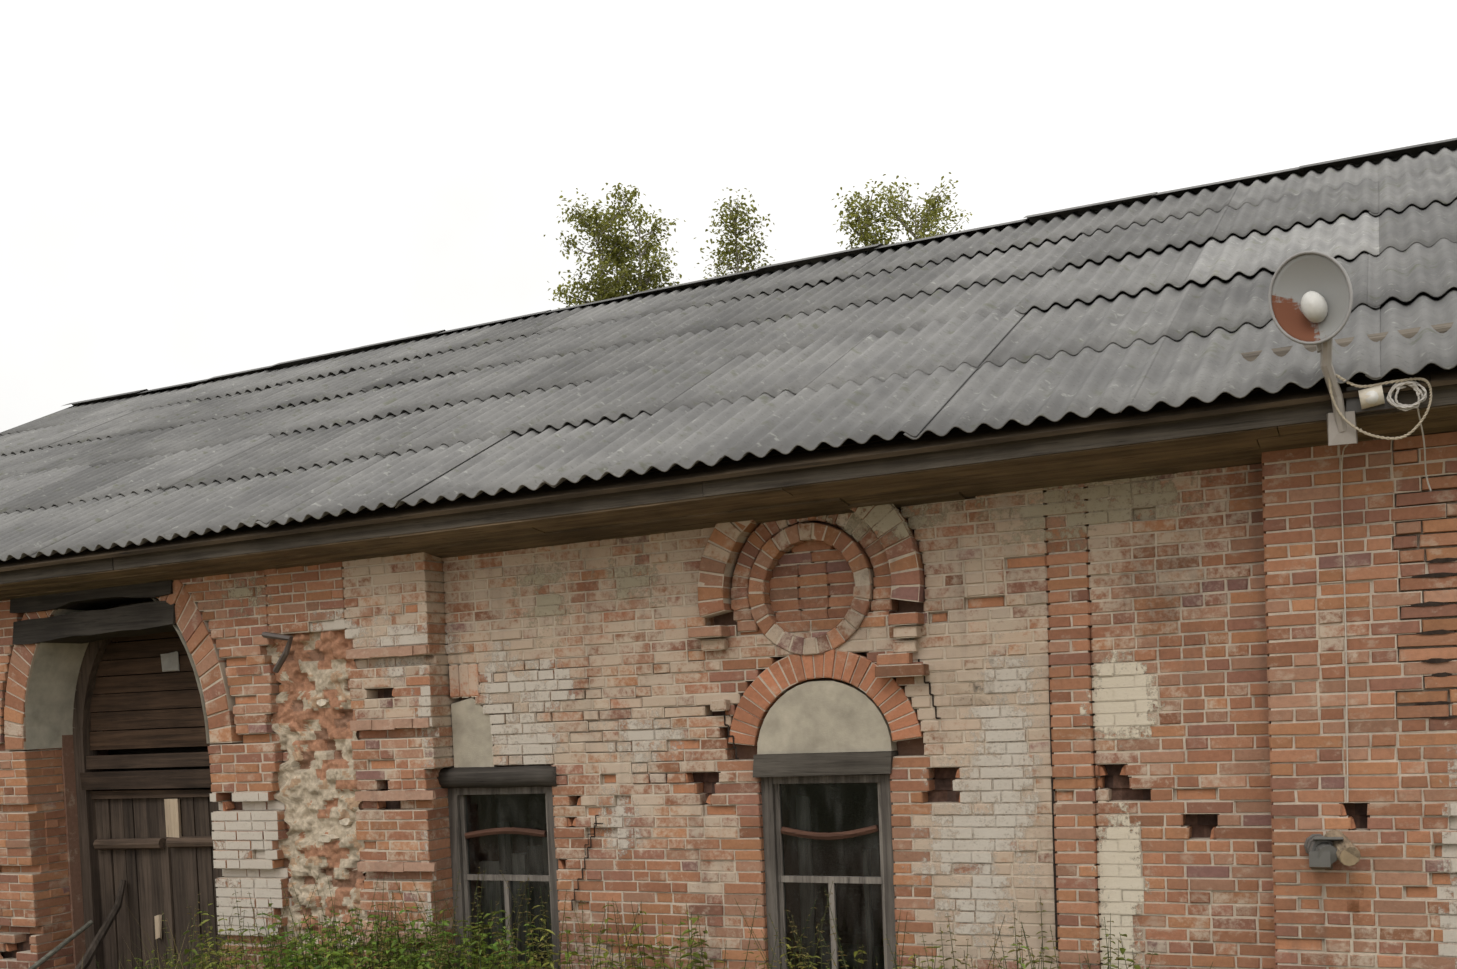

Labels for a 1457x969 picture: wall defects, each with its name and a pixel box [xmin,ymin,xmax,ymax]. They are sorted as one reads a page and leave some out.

spalling [223,792,243,811]
spalling [266,610,401,969]
spalling [0,926,37,959]